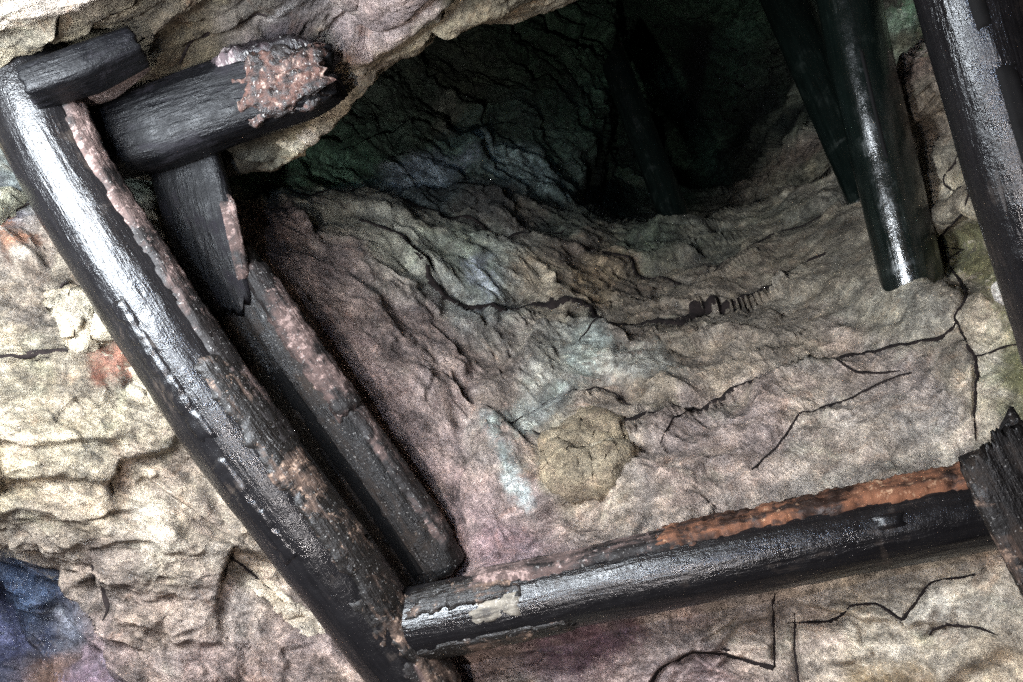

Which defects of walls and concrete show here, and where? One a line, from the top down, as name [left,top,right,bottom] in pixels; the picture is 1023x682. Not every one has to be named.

crack [359,196,772,341]
crack [751,156,1017,470]
crack [500,379,753,443]
crack [650,574,976,682]
crack [929,623,997,636]